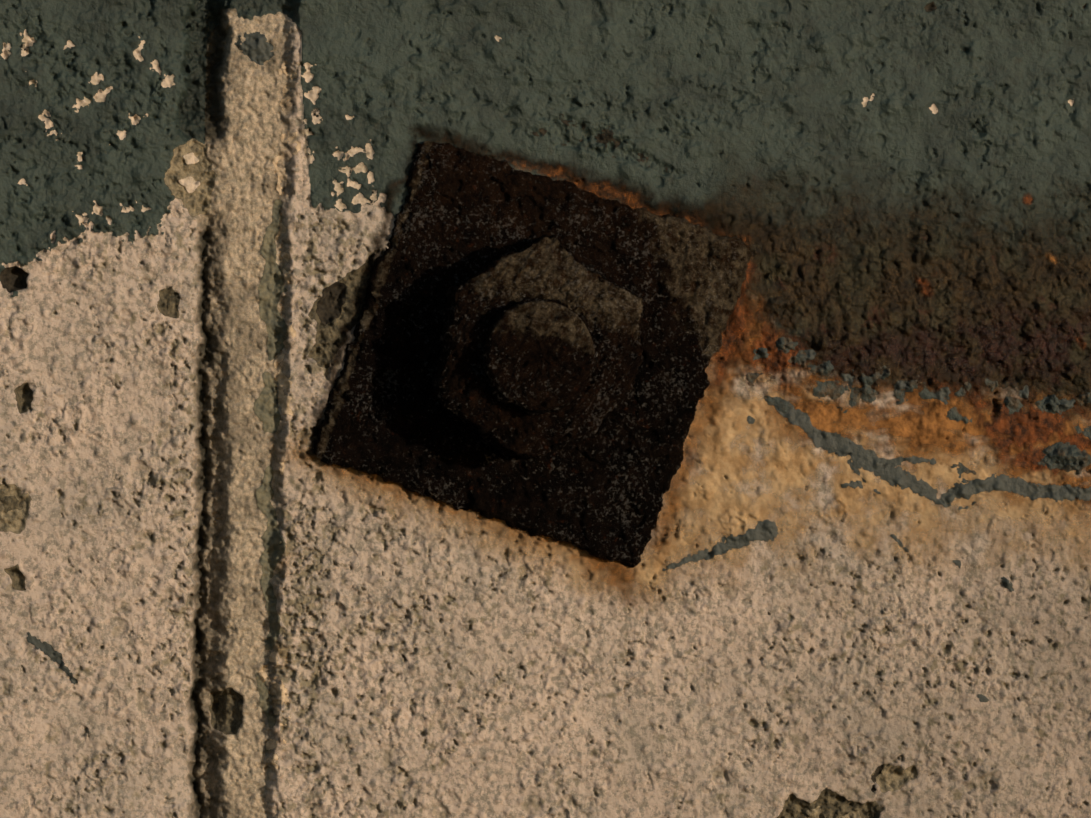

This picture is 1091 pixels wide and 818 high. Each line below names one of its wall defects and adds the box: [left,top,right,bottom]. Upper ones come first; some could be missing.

peeling [72,72,113,113]
peeling [133,36,175,88]
spalling [164,138,217,217]
peeling [331,139,377,211]
peeling [234,31,323,434]
spalling [0,266,28,293]
spalling [157,287,180,318]
spalling [307,254,373,368]
corrosion [293,128,1091,595]
spalling [14,383,33,414]
peeling [256,457,291,769]
spalling [209,687,243,735]